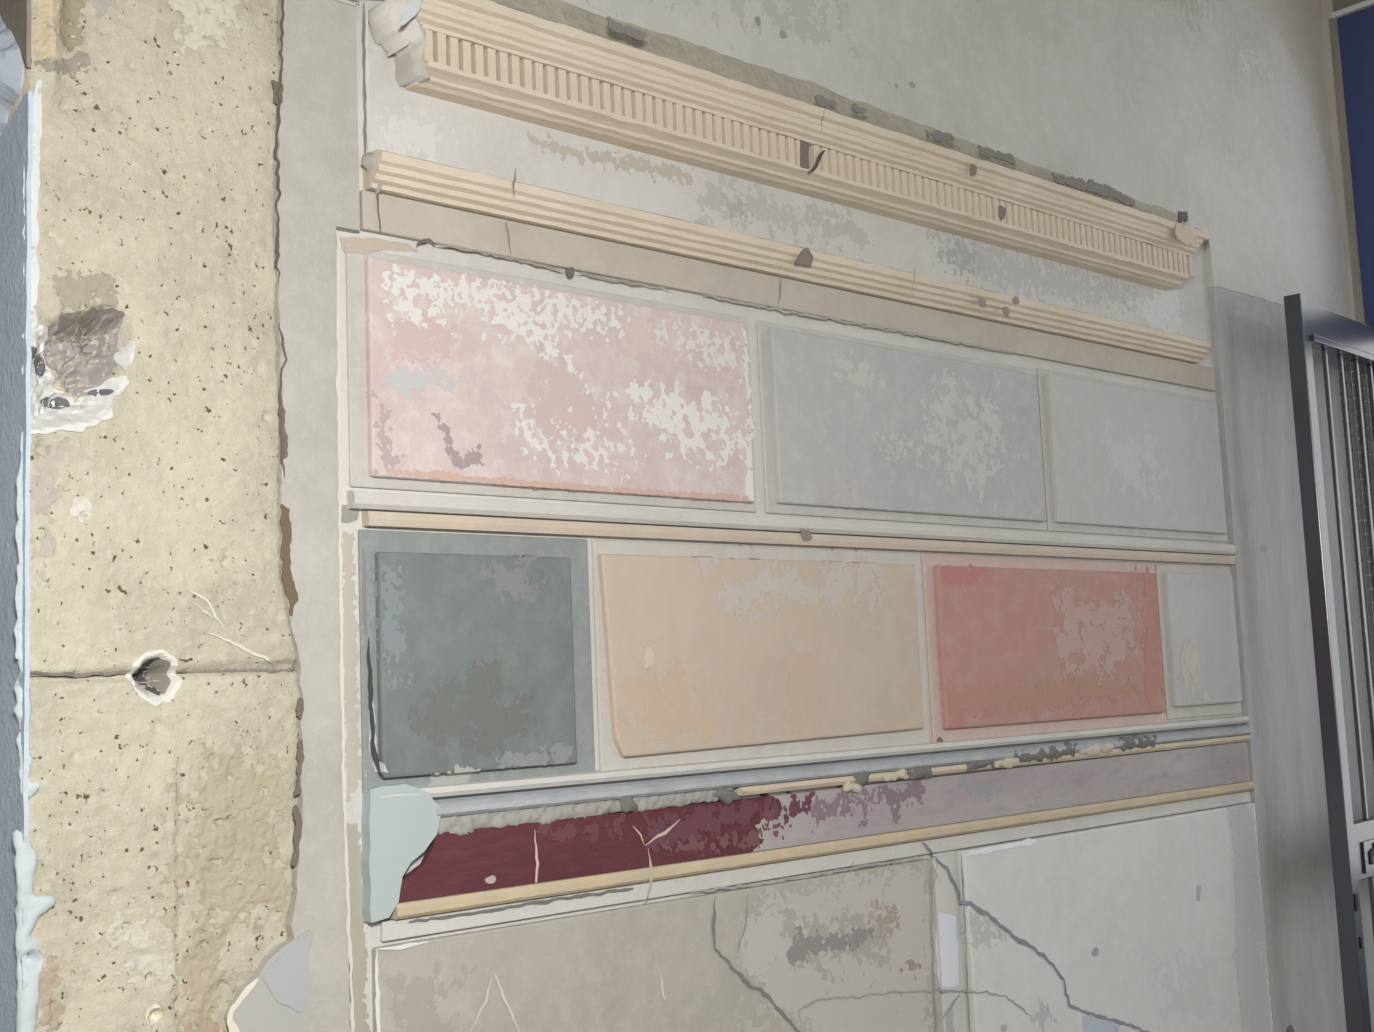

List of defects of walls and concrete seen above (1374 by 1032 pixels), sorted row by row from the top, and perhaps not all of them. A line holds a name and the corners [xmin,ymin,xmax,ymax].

spalling [31,306,125,409]
spalling [125,649,183,706]
peeling [336,231,754,1032]
peeling [1047,575,1144,686]
spalling [843,766,932,793]
crack [409,819,681,923]
peeling [661,809,792,857]
crack [689,842,1149,1032]
spalling [227,978,258,1032]